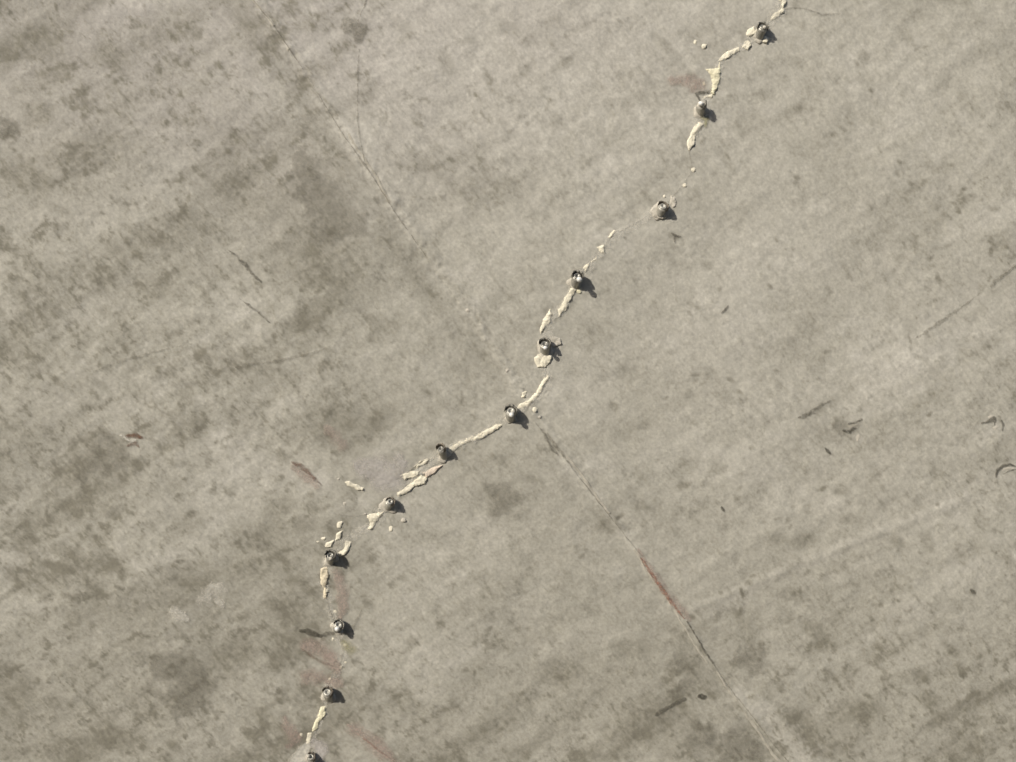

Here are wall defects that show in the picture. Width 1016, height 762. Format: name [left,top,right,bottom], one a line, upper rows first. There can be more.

crack [633,549,781,762]